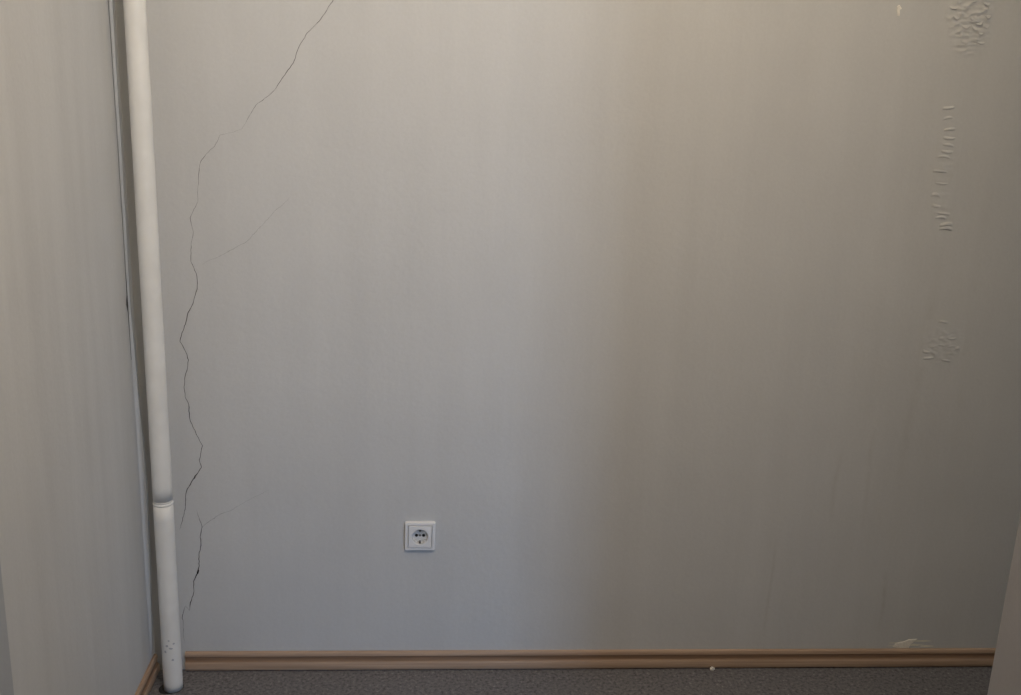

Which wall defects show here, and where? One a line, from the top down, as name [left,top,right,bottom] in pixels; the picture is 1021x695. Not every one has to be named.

crack [180,138,219,637]